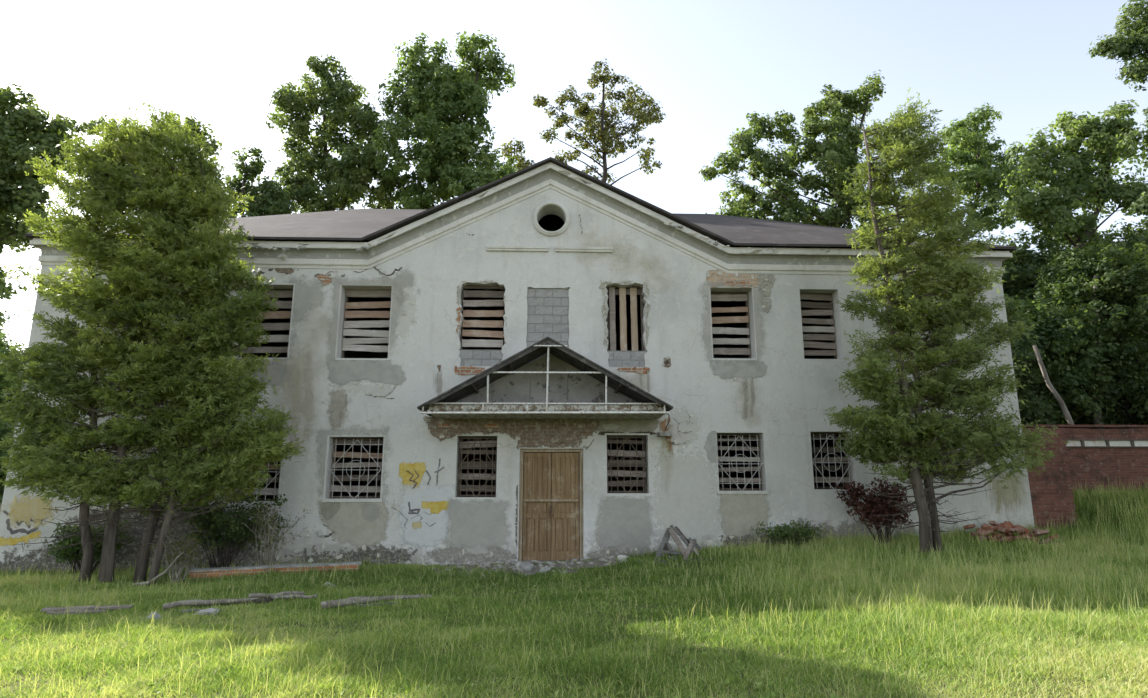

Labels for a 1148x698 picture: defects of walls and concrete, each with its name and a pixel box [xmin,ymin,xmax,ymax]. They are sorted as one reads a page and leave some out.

flaking render [317,274,334,286]
flaking render [705,269,776,313]
flaking render [437,365,485,375]
flaking render [424,416,599,449]